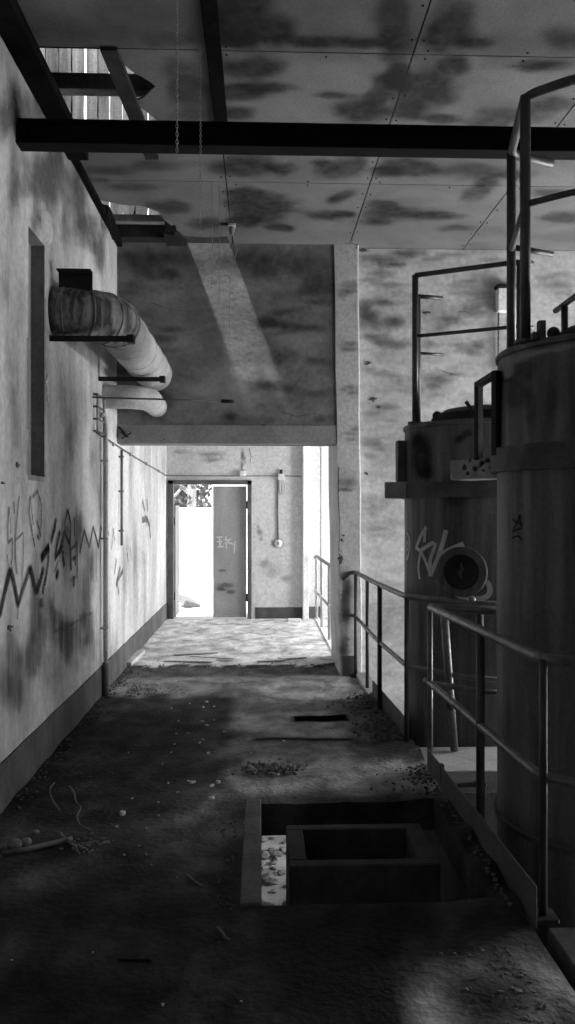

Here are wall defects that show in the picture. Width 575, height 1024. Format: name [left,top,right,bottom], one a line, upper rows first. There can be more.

damp [218,0,487,123]
damp [215,158,293,231]
damp [313,193,353,220]
damp [375,159,437,176]
damp [369,201,451,224]
damp [1,550,94,704]